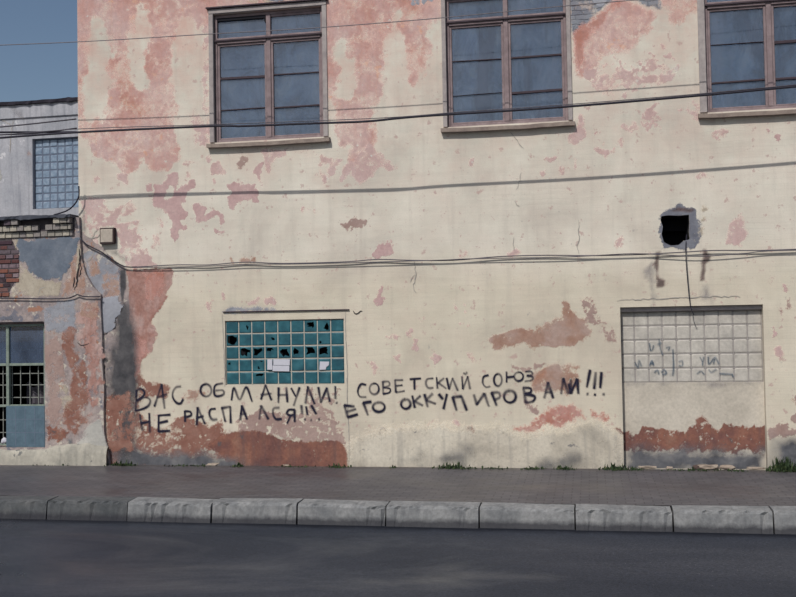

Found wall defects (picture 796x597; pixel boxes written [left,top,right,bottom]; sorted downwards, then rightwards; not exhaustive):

peeling [570,0,697,99]
peeling [77,0,286,241]
peeling [319,0,441,184]
spalling [658,204,707,250]
crack [73,229,100,290]
peeling [0,197,348,467]
peeling [489,297,616,350]
damp [111,270,237,466]
peeling [512,363,581,394]
peeling [515,400,609,432]
peeling [616,413,796,455]
damp [779,440,796,466]